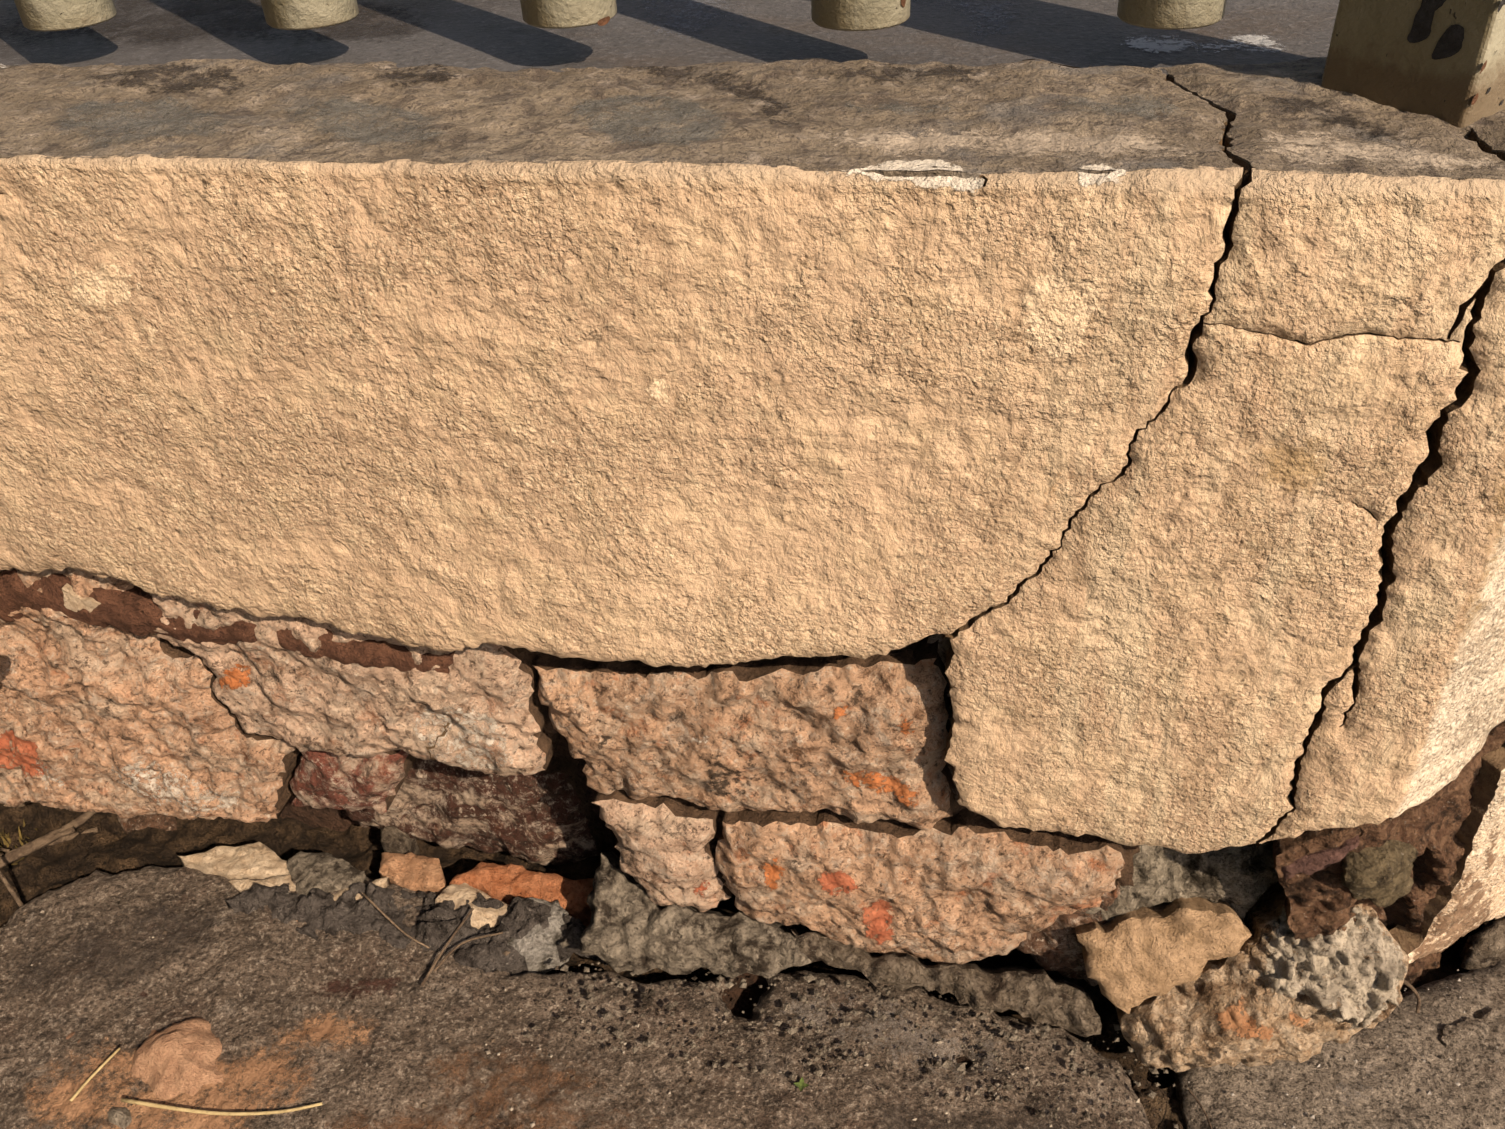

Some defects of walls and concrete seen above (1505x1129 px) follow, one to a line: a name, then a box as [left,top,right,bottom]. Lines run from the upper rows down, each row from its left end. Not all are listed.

crack [941,76,1505,848]
flaking render [0,569,257,645]
flaking render [276,628,456,674]
spalling [219,664,252,690]
spalling [0,730,48,778]
spalling [842,770,919,807]
spalling [761,858,786,891]
spalling [817,870,858,895]
flaking render [1260,720,1505,1031]
spalling [862,899,894,945]